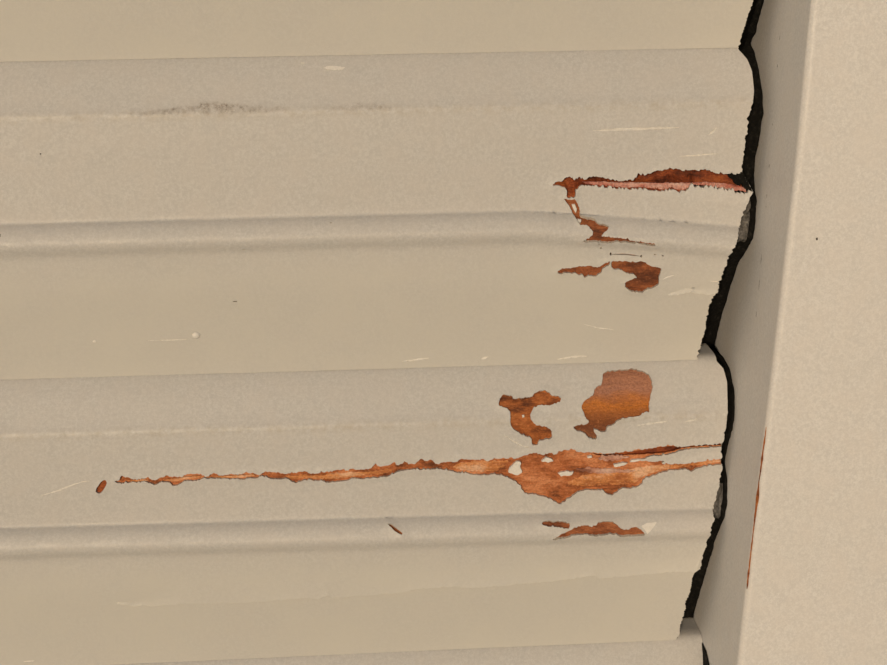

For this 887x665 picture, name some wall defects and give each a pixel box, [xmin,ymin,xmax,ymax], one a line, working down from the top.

peeling [558,261,661,291]
peeling [499,390,561,444]
peeling [574,369,652,439]
peeling [542,521,657,538]